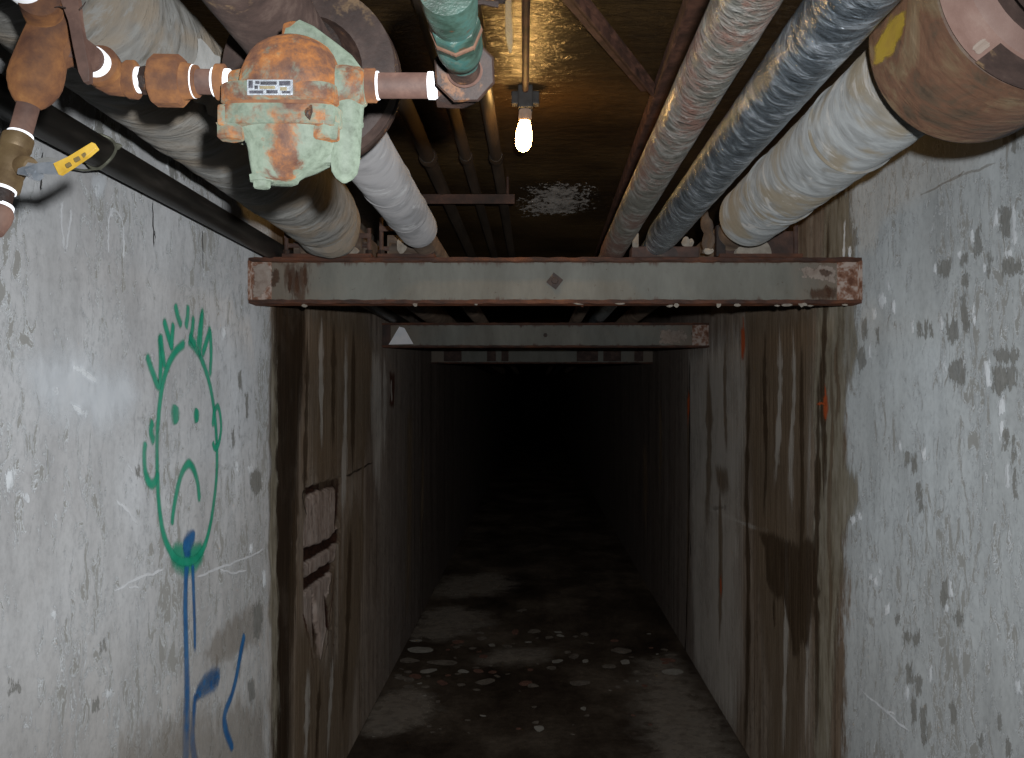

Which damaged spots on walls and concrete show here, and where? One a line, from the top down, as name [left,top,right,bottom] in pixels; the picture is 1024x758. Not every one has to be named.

leakage [822,192,855,258]
corrosion [285,263,307,299]
peeling [942,355,968,387]
peeling [984,343,1019,500]
peeling [898,441,926,514]
leakage [686,306,858,758]
spalling [302,458,372,687]
peeling [884,603,920,647]
peeling [941,578,964,626]
peeling [905,662,933,747]